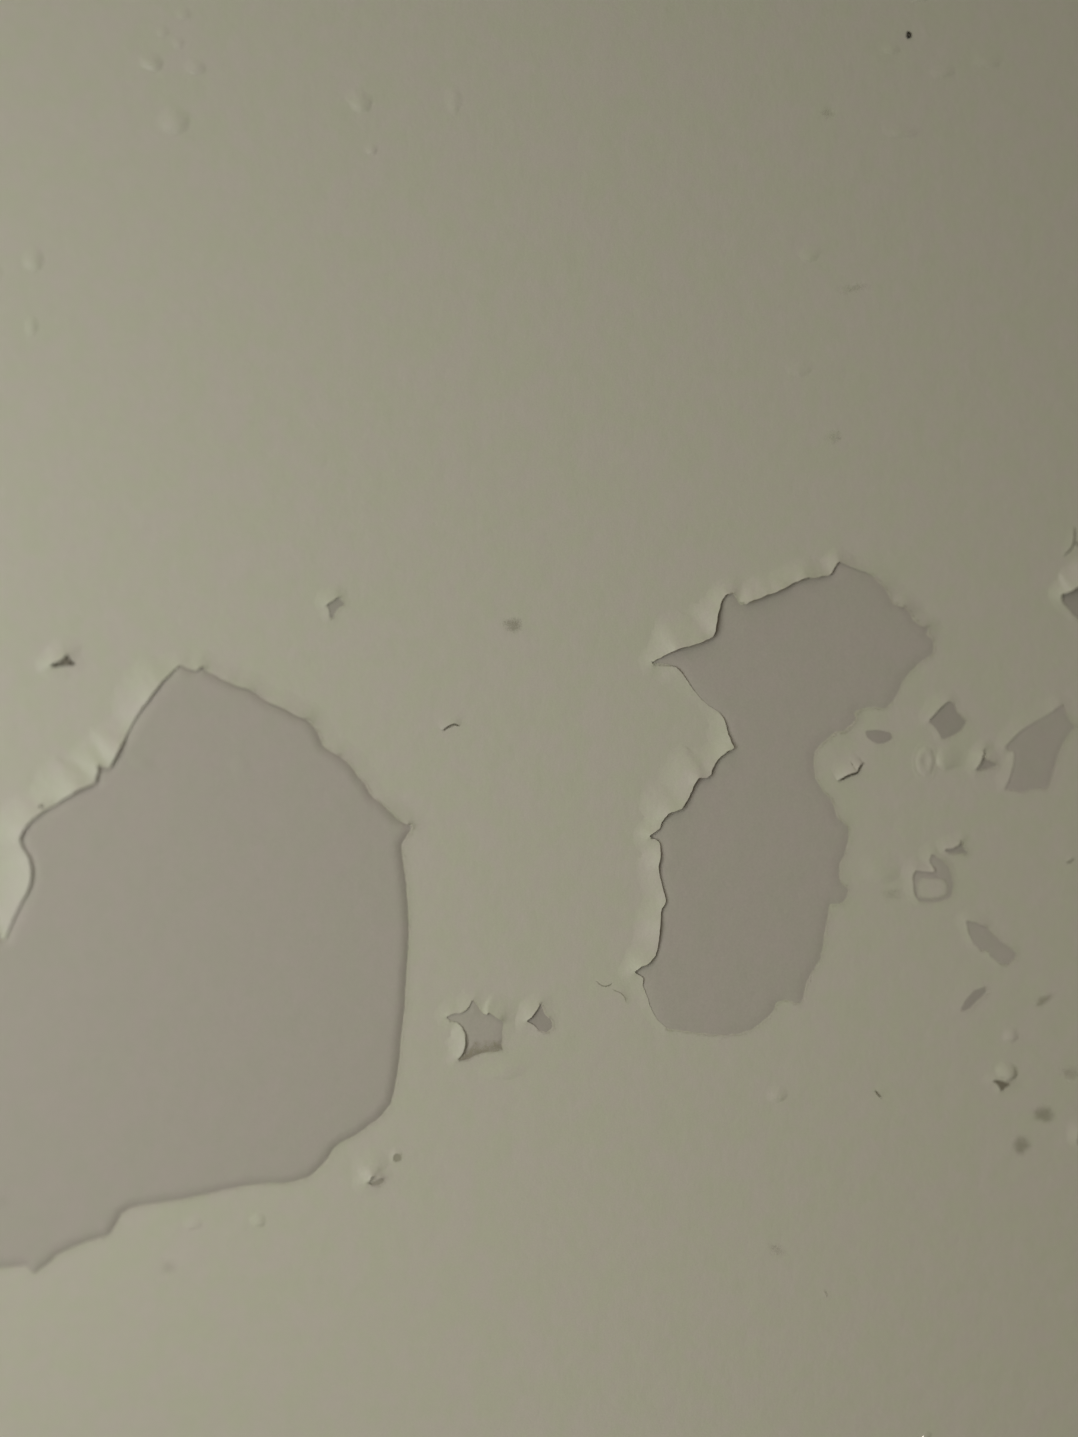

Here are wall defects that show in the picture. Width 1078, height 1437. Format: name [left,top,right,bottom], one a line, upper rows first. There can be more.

peeling [1047,554,1078,625]
peeling [617,547,944,1043]
peeling [963,737,1002,782]
peeling [434,986,559,1070]
peeling [350,1148,405,1198]